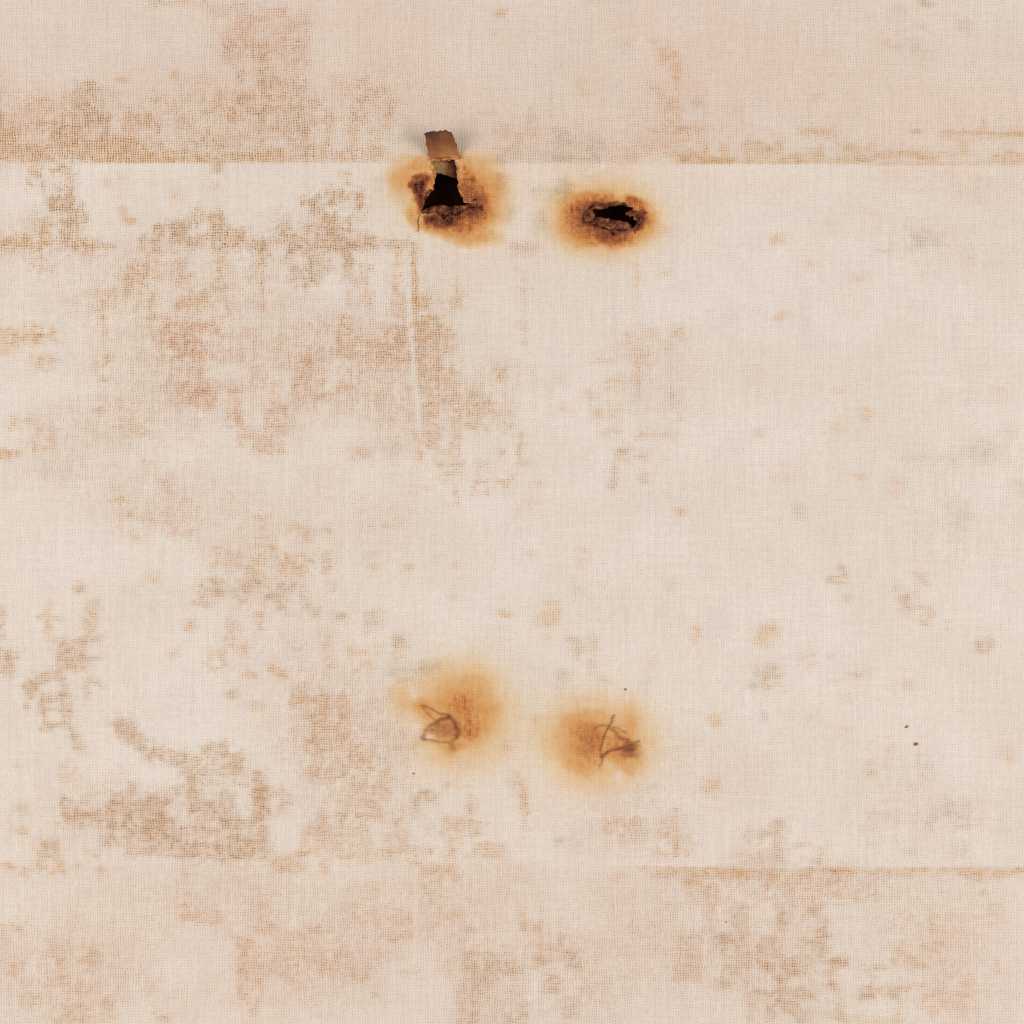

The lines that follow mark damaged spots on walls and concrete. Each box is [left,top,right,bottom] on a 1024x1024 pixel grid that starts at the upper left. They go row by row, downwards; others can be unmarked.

peeling [422,205,465,214]
peeling [584,210,640,230]